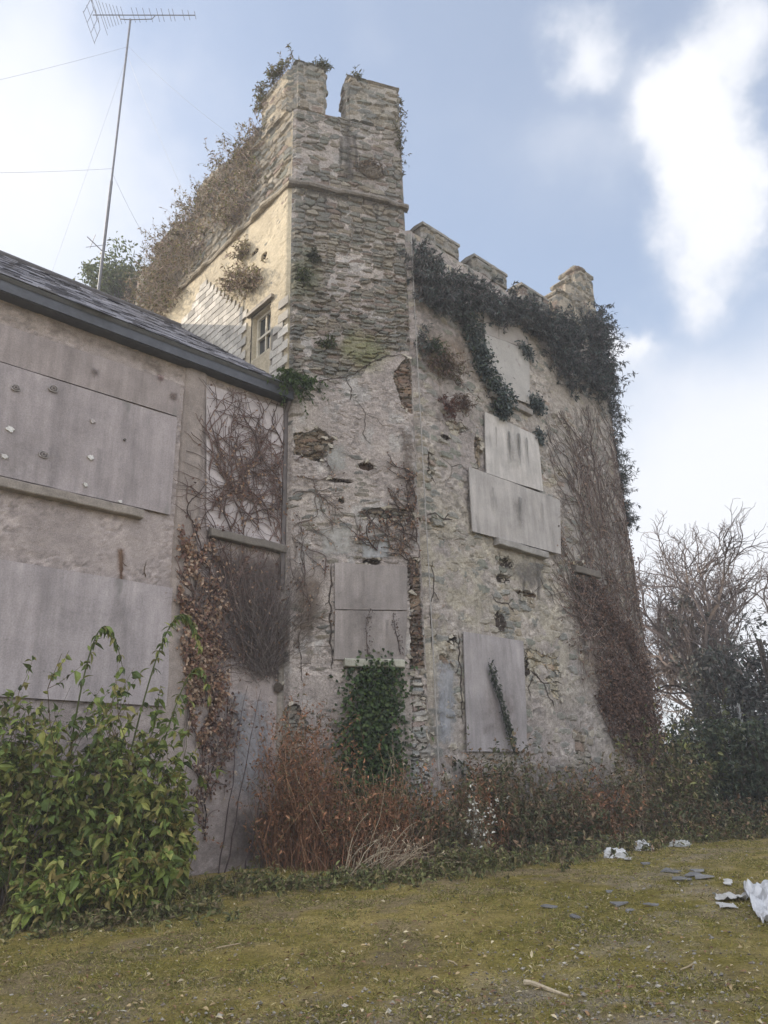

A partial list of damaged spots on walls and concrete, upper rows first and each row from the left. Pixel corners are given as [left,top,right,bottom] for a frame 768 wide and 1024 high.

spalling [394,353,412,414]
spalling [294,425,338,462]
spalling [406,558,435,808]
damp [235,694,268,794]